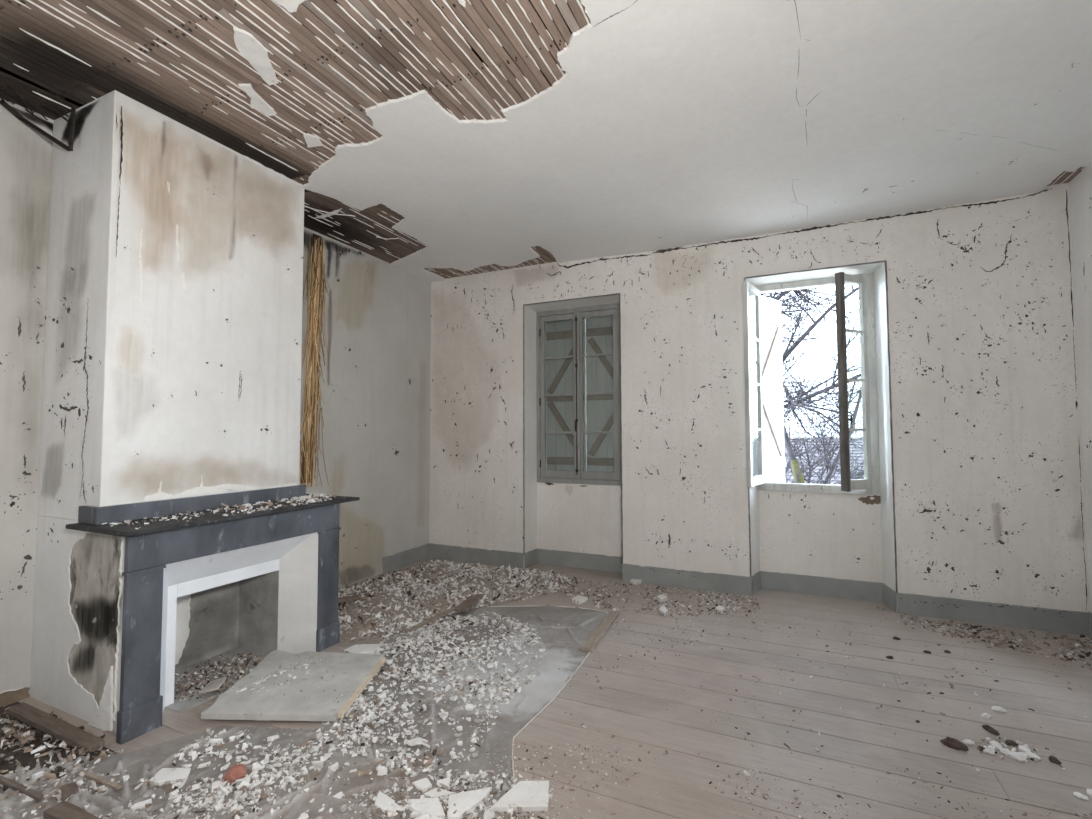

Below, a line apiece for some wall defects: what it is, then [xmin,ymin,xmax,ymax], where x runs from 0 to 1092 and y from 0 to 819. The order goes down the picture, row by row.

flaking render [0,0,591,264]
peeling [17,266,75,344]
flaking render [421,246,557,342]
damp [73,647,94,670]